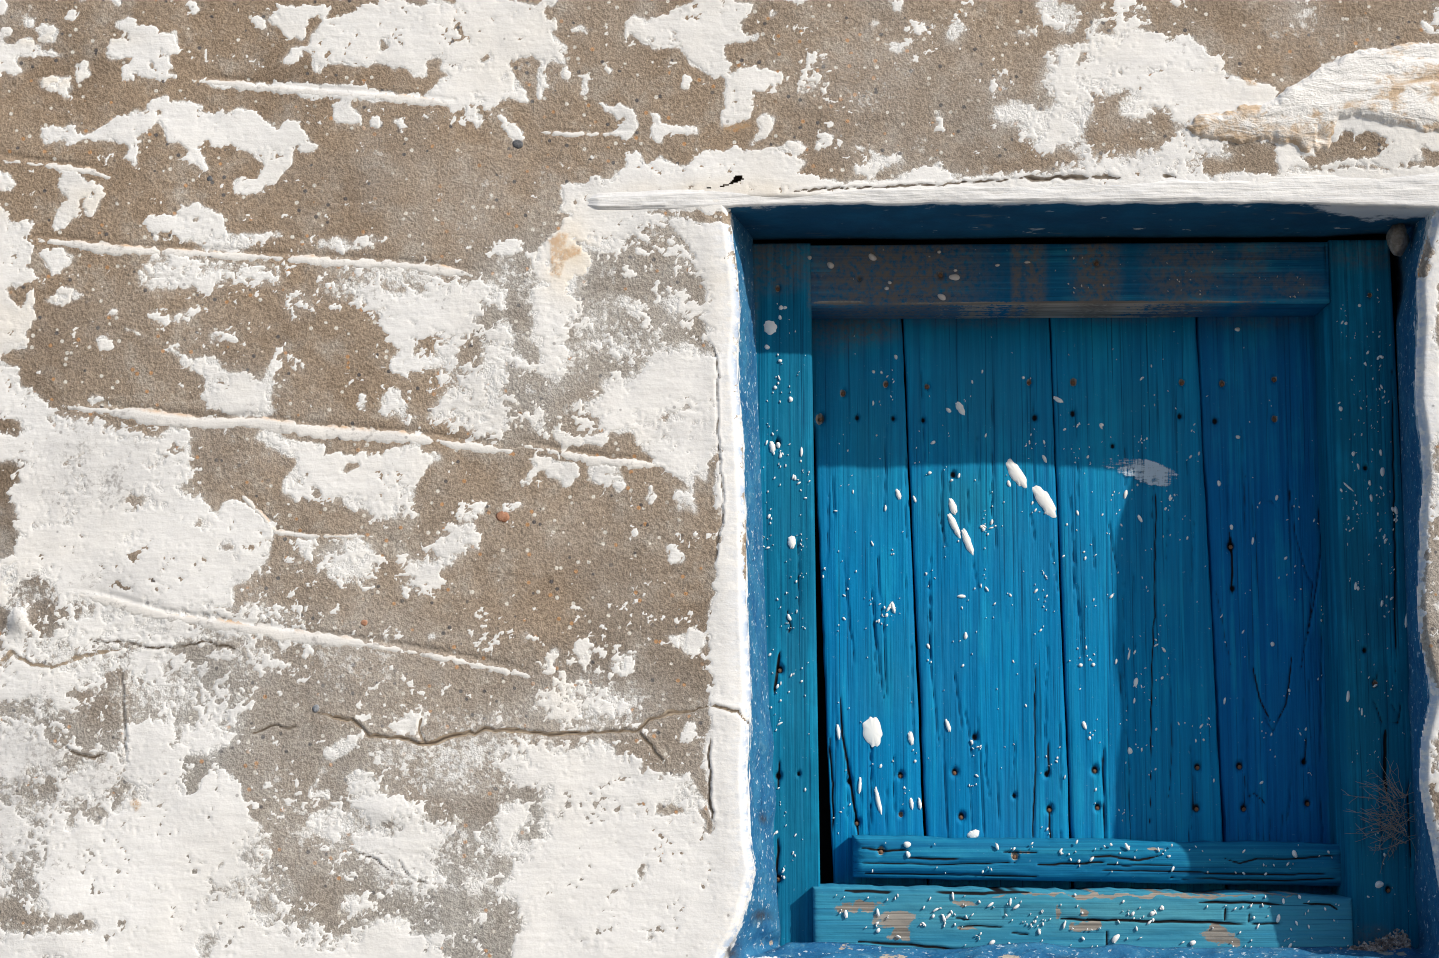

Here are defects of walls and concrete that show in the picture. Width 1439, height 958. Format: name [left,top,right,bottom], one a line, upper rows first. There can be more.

peeling [379,28,411,52]
peeling [401,0,470,45]
peeling [1398,146,1439,169]
peeling [1417,210,1439,352]
peeling [0,407,32,437]
peeling [340,462,360,474]
peeling [123,475,167,519]
crack [0,640,235,760]
crack [253,704,749,819]
peeling [579,777,632,824]
peeling [596,829,685,935]
peeling [194,914,245,958]